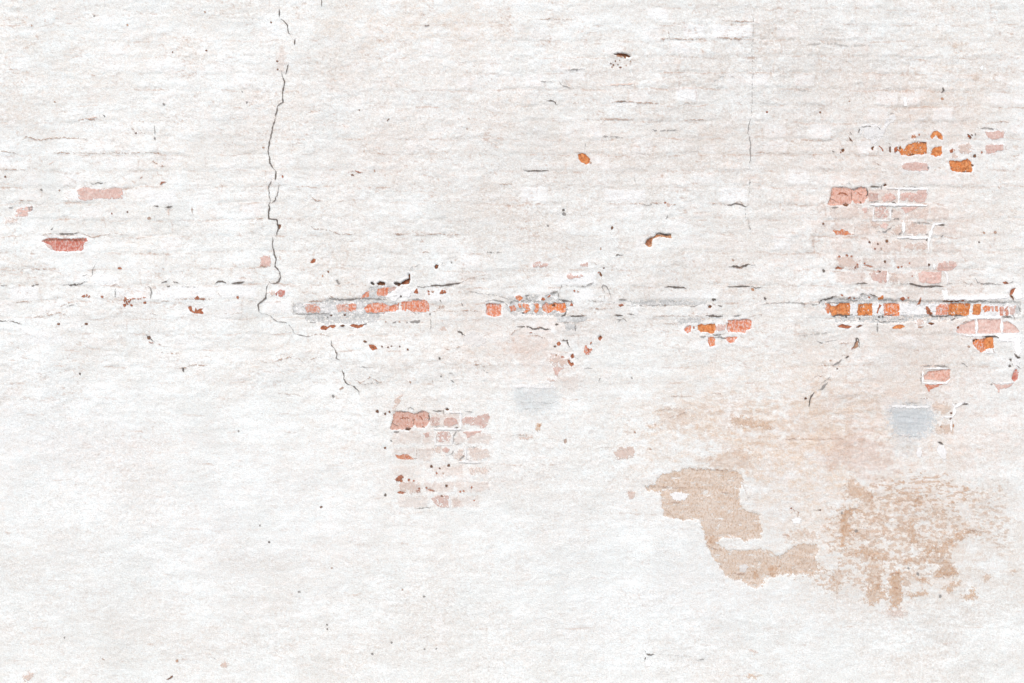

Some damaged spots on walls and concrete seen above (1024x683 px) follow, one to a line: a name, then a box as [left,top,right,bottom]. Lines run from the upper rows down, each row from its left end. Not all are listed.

peeling [832,113,1005,172]
crack [146,10,378,398]
peeling [42,238,88,252]
peeling [292,274,446,330]
peeling [486,291,587,317]
peeling [812,183,1023,392]
peeling [684,319,752,347]
peeling [920,365,951,399]
peeling [384,407,490,509]